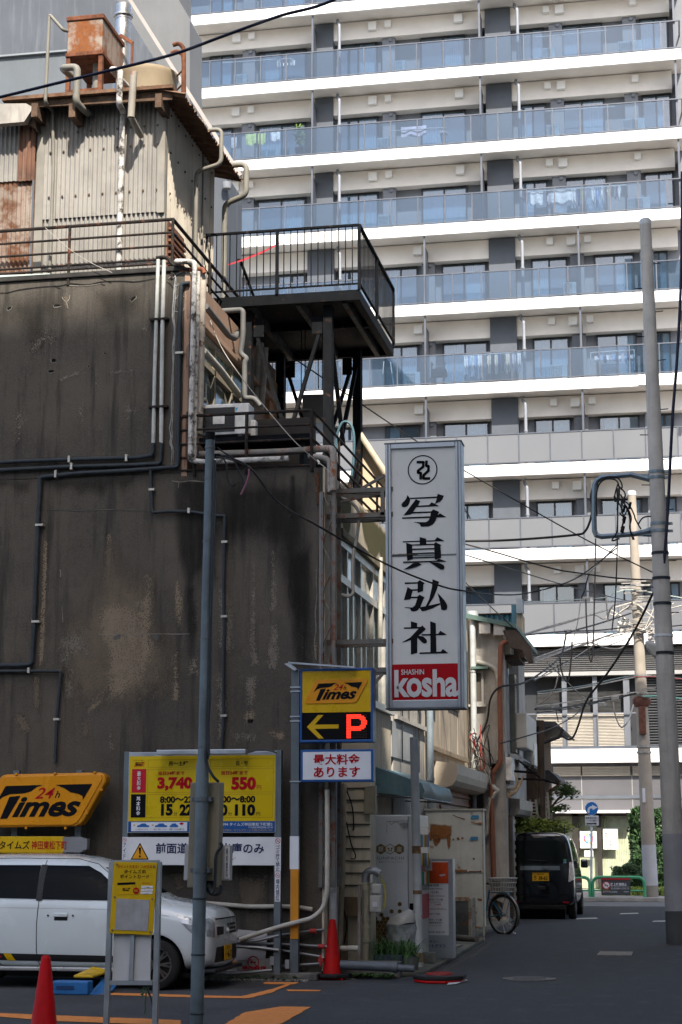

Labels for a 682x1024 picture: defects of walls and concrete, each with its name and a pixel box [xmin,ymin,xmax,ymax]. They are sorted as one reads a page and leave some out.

rust [17,125,36,181]
damp [172,477,308,708]